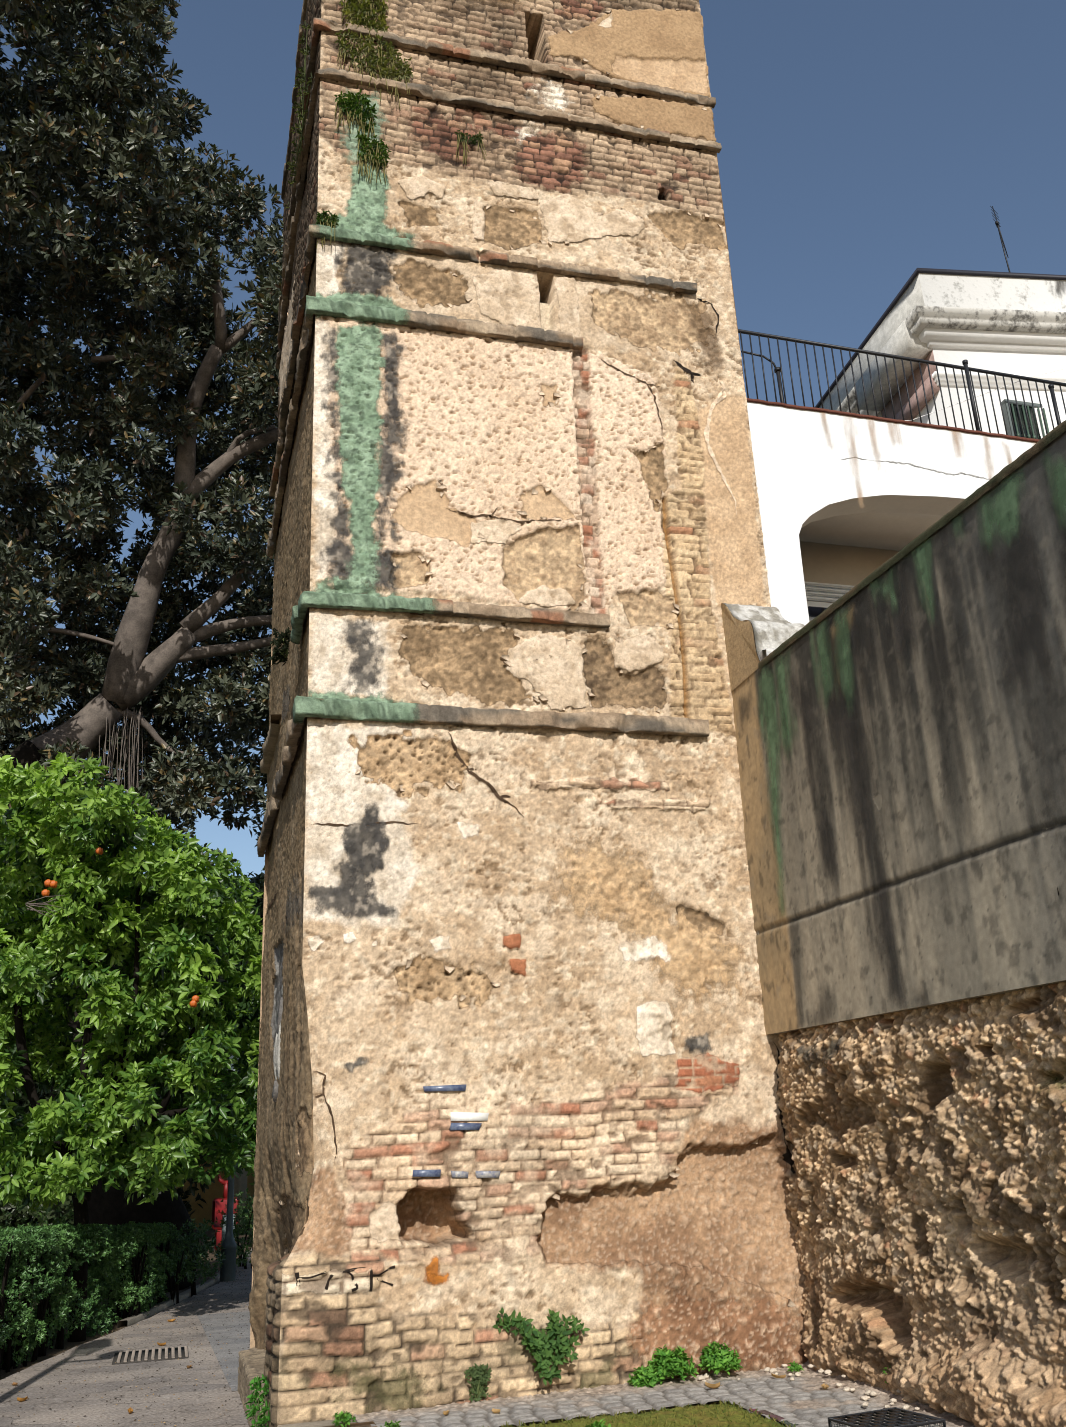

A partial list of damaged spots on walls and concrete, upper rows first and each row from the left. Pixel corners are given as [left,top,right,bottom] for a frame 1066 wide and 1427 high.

leakage [338,94,385,160]
peeling [548,0,716,141]
leakage [334,241,400,297]
leakage [320,328,407,591]
peeling [391,479,589,611]
spalling [398,590,680,713]
leakage [283,803,395,928]
spalling [349,730,472,798]
crack [448,732,524,817]
leakage [828,608,906,1003]
crack [773,1042,795,1174]
spalling [396,1188,466,1244]